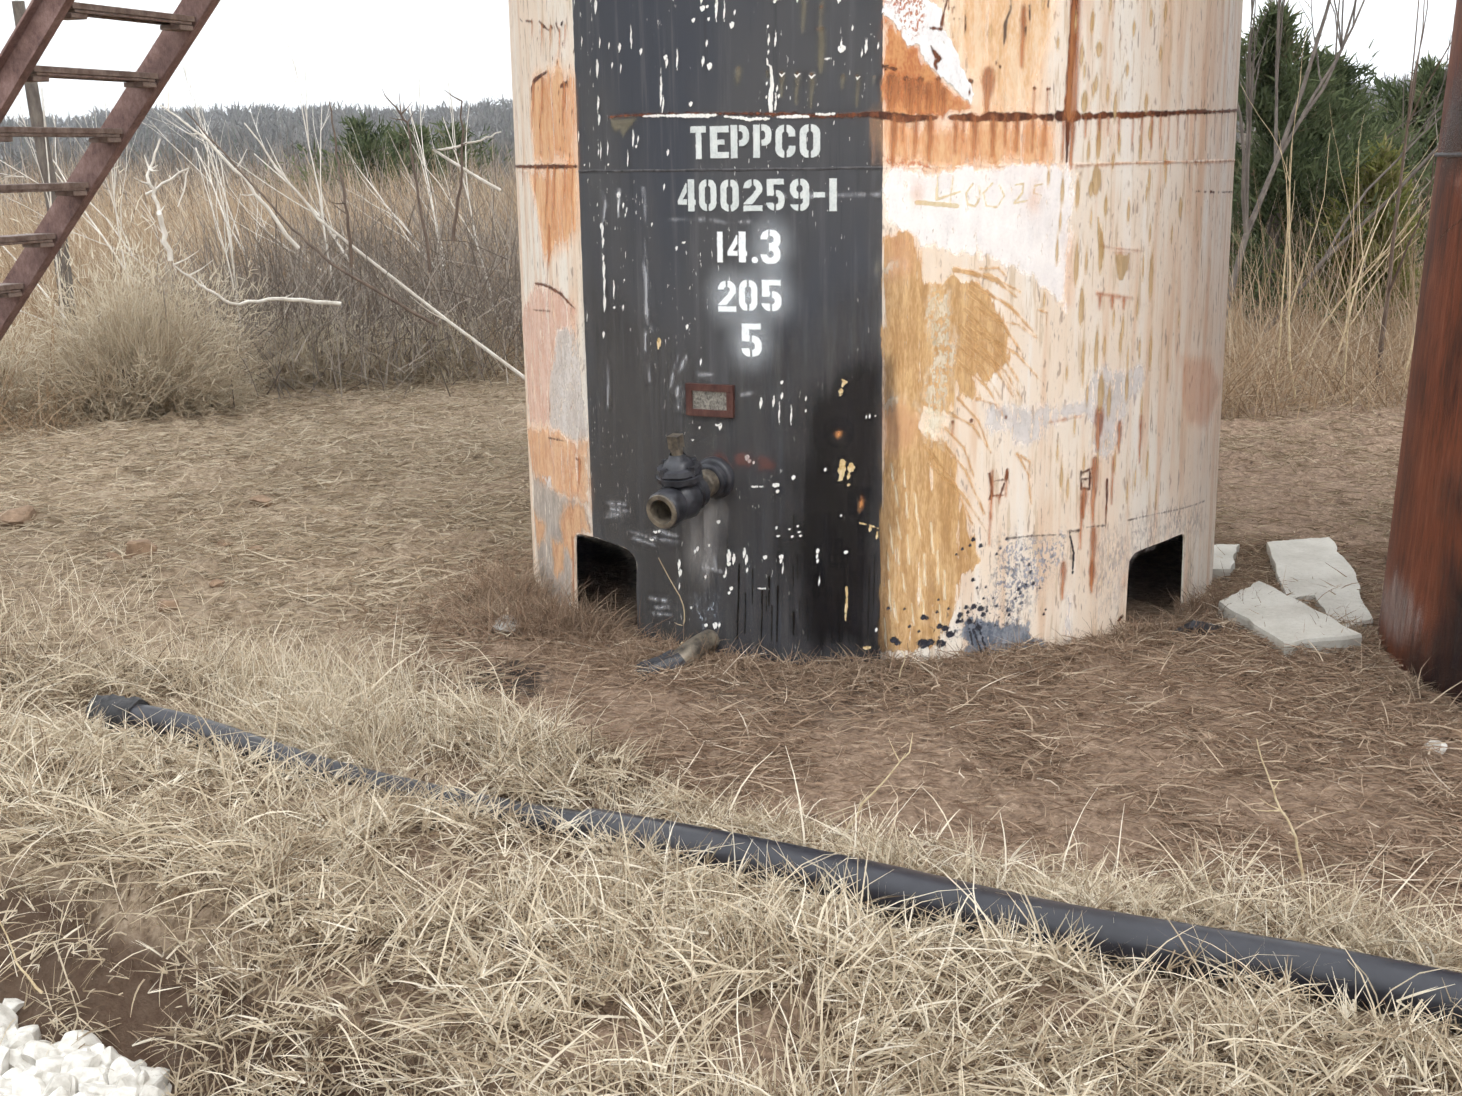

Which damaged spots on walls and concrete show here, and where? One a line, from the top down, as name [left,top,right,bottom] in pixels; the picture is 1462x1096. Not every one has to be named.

peeling [581,26,642,78]
peeling [660,50,678,112]
peeling [691,0,736,29]
peeling [824,25,879,60]
rust [608,0,1238,172]
rust [515,19,592,605]
peeling [759,380,807,425]
peeling [824,459,855,486]
peeling [705,525,802,594]
peeling [863,531,1066,657]